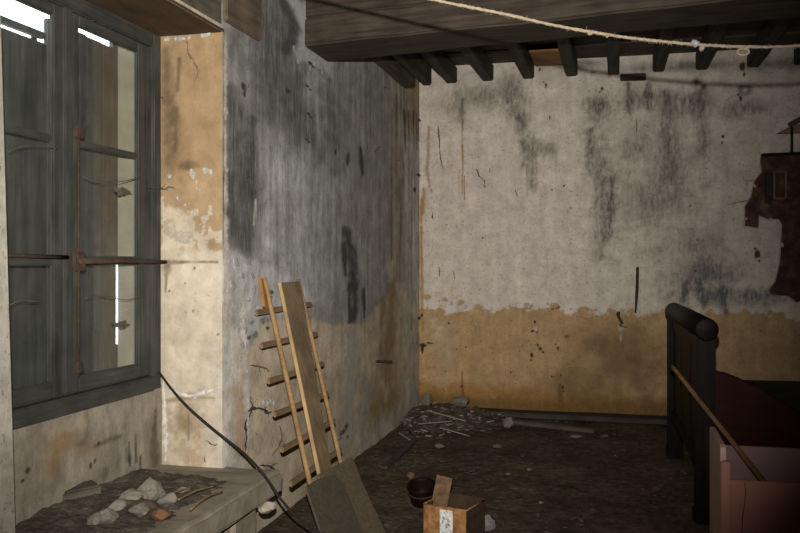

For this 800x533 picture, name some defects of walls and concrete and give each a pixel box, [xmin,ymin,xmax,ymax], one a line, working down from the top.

crack [186,41,199,83]
spalling [745,155,800,302]
water stain [682,264,732,309]
crack [244,396,283,472]